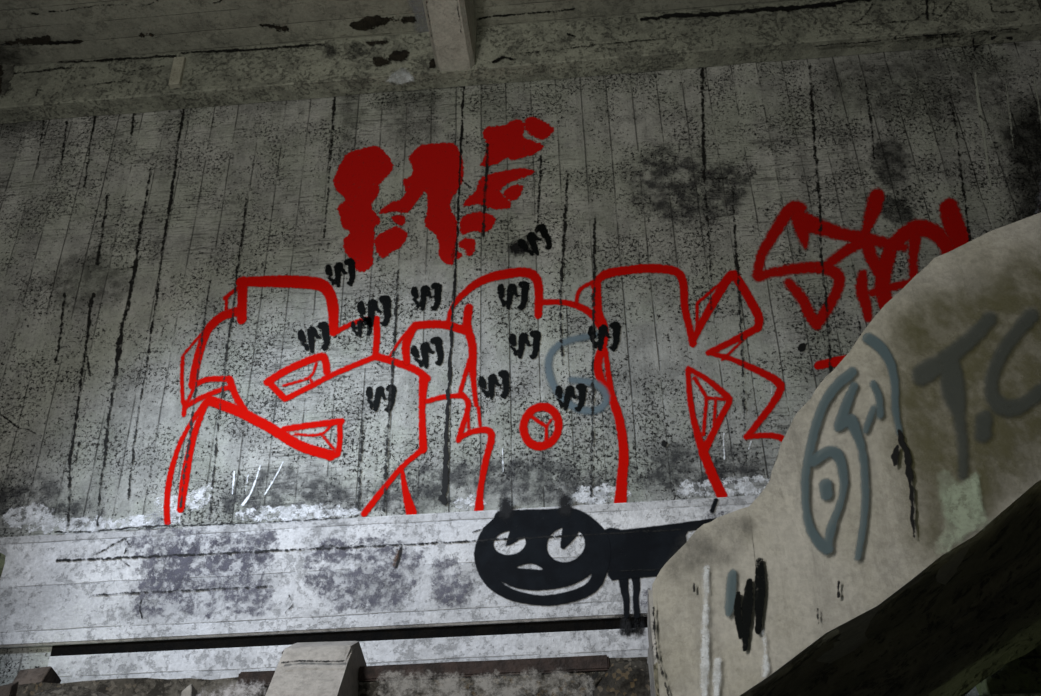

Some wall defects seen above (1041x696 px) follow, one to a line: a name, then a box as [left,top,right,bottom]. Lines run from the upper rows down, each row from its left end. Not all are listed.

spalling [349,15,416,66]
damp [634,148,748,222]